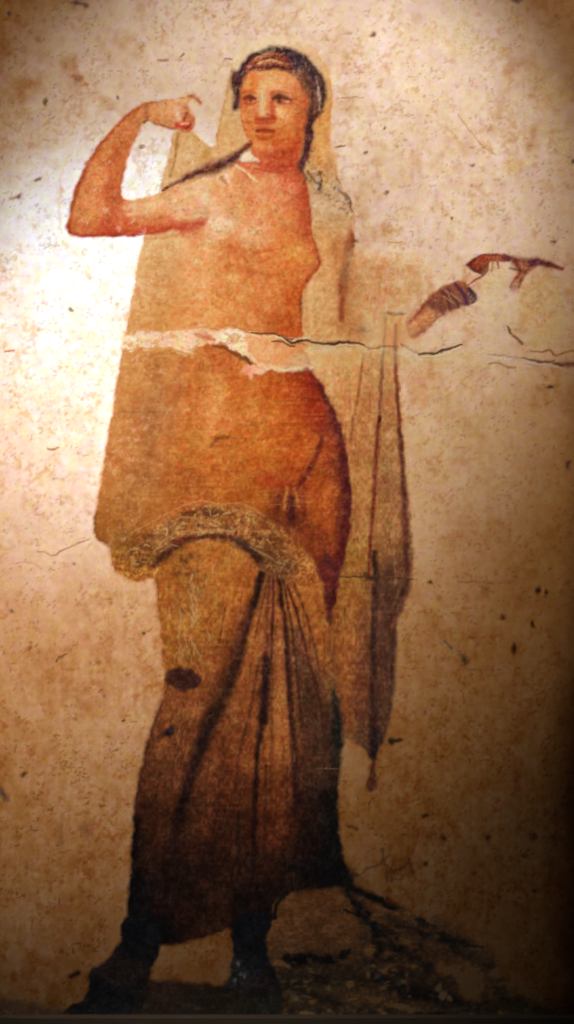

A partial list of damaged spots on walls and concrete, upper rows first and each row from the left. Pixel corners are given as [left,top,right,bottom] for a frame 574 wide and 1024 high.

spalling [122,326,315,378]
crack [247,332,365,347]
crack [419,344,463,355]
crack [489,326,574,368]